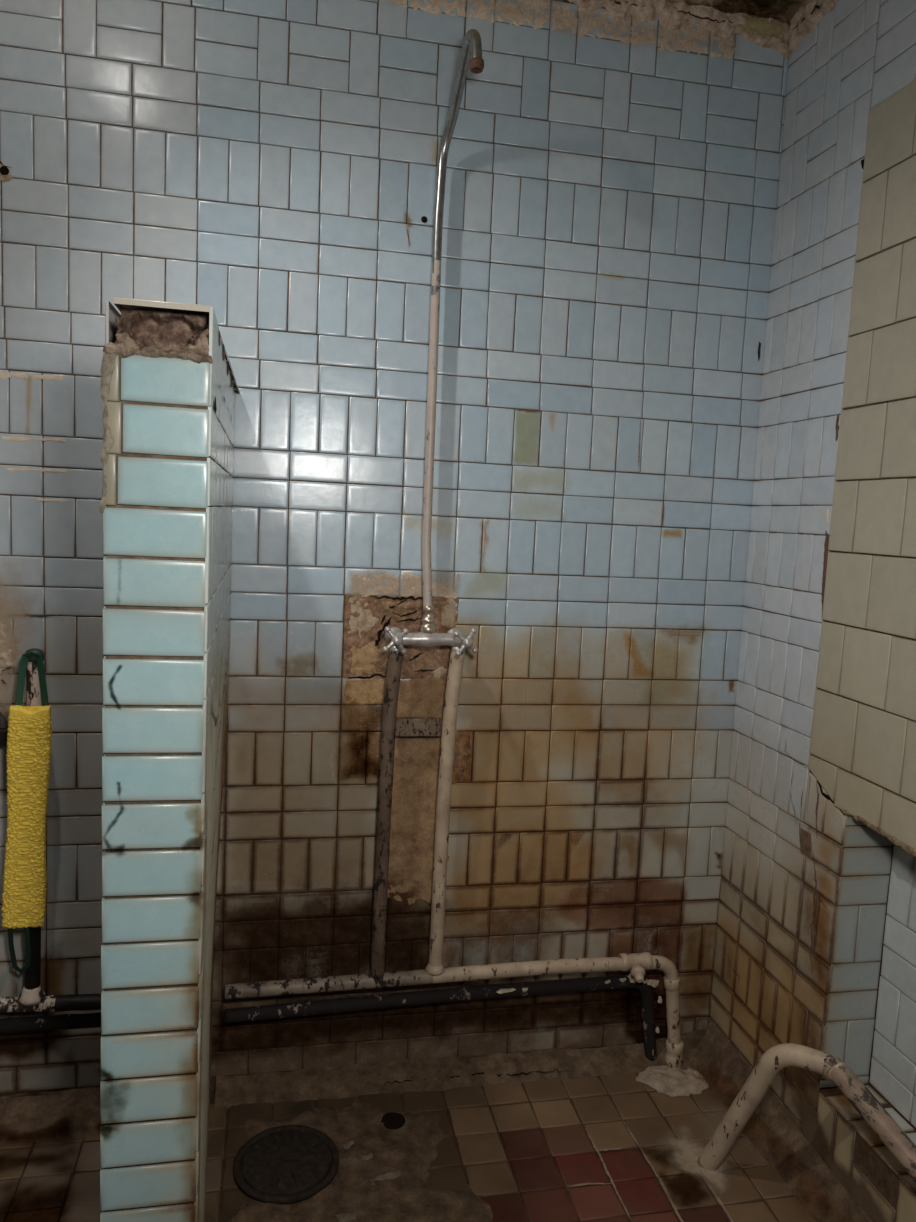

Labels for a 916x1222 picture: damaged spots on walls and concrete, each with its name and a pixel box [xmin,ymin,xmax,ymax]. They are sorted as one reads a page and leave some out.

peeling [382,0,840,60]
spalling [0,161,13,183]
spalling [0,372,63,381]
flaking render [99,308,232,514]
flaking render [343,572,459,679]